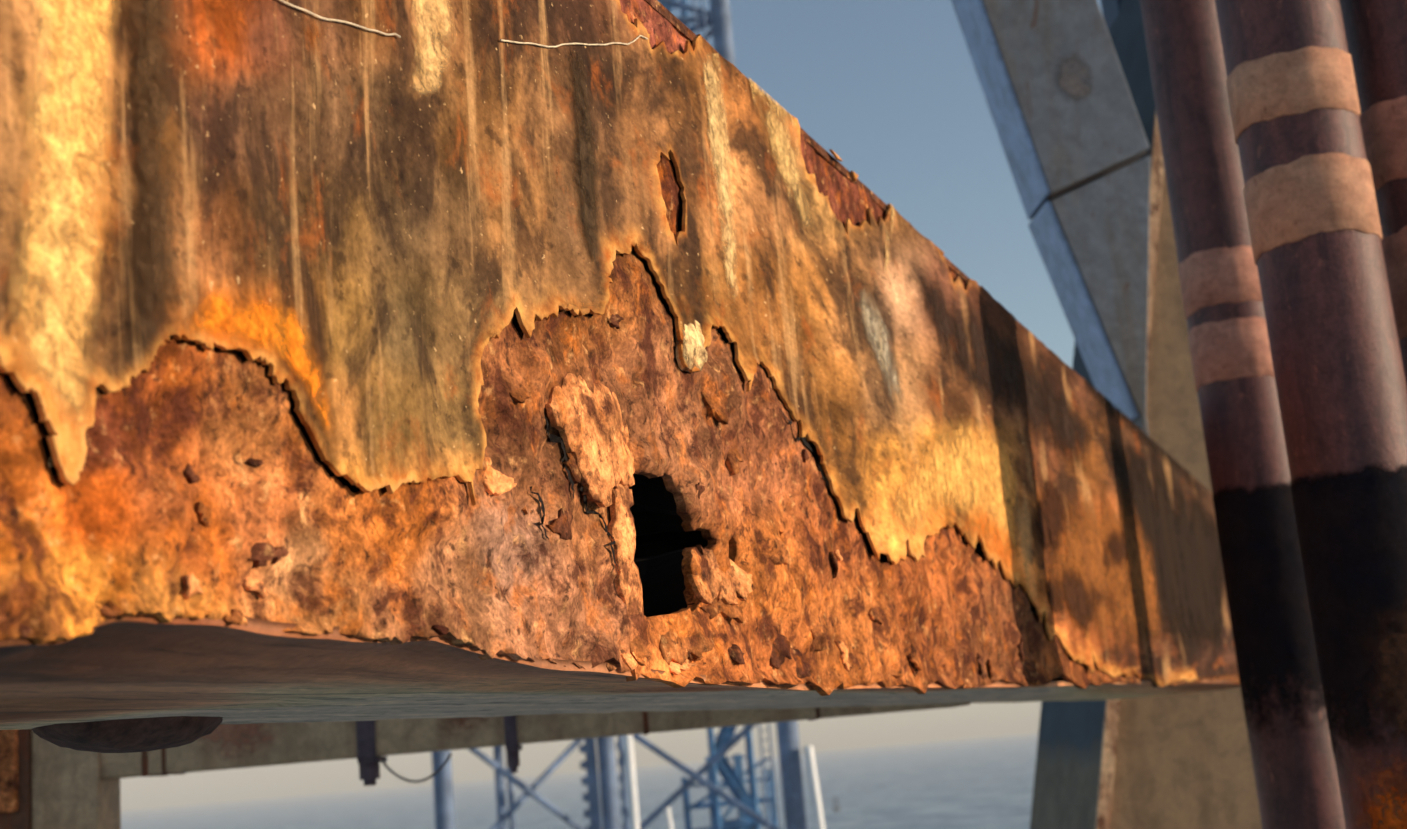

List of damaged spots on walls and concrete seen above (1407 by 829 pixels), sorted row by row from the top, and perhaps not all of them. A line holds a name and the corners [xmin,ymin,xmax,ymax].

spalling [657,155,681,237]
leakage [863,306,896,382]
rust [0,252,1240,696]
leakage [896,427,1016,549]
rust [1358,766,1407,829]